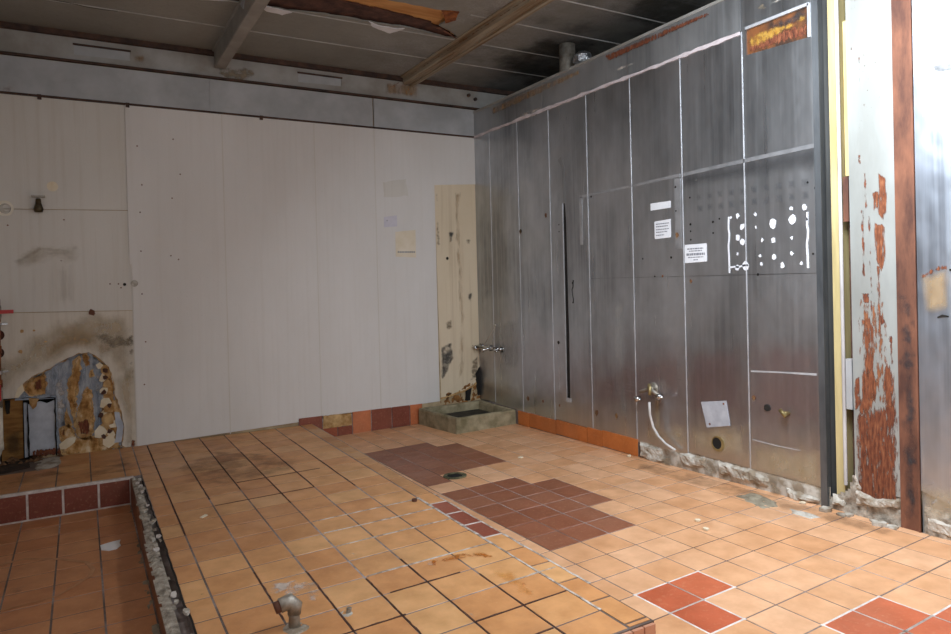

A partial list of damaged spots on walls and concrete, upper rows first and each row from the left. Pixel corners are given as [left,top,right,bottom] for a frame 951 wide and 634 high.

peeling [264,6,292,15]
peeling [369,21,405,33]
rust [606,13,709,60]
leakage [637,0,698,26]
rust [749,18,806,51]
rust [854,174,915,500]
leakage [21,355,104,443]
peeling [95,362,124,448]
peeling [59,437,76,449]
spalling [627,442,901,530]